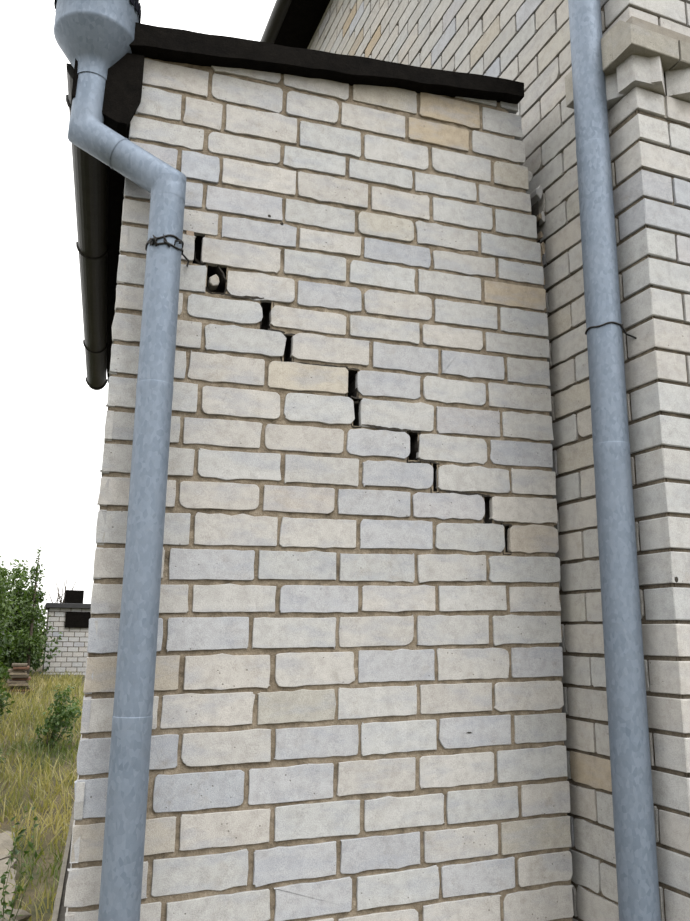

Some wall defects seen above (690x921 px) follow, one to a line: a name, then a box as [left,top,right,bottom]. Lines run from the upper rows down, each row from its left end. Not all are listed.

crack [528,171,545,285]
crack [186,230,512,555]